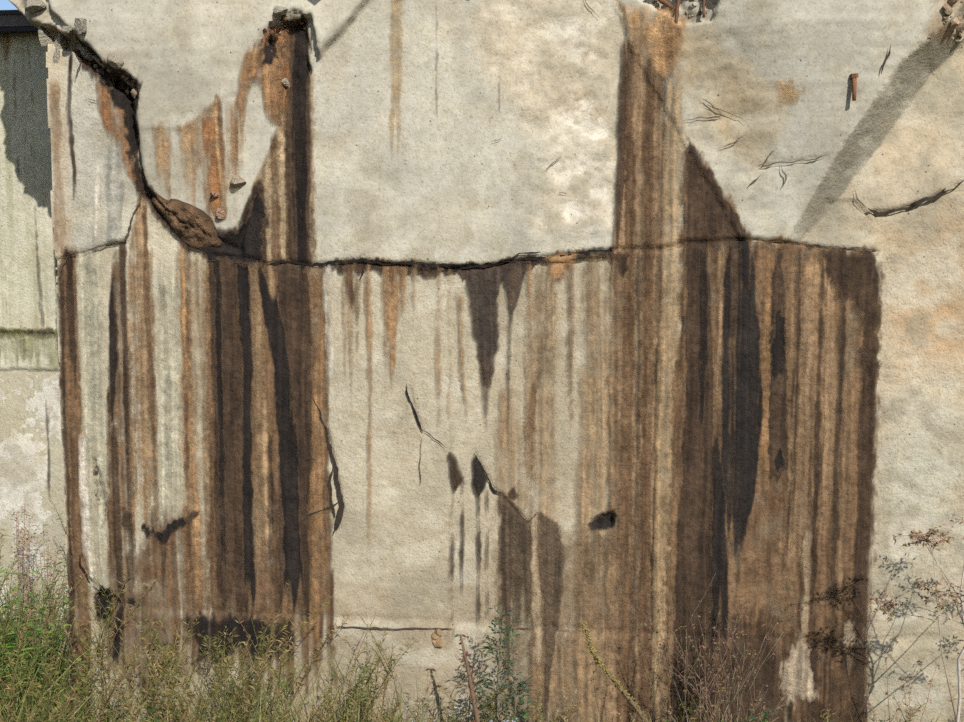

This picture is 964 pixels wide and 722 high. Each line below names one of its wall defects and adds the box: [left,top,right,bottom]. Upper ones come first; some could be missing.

spalling [652,0,717,18]
spalling [38,18,139,99]
crack [58,195,142,279]
crack [854,180,964,216]
damp [50,36,617,722]
crack [406,384,445,484]
crack [474,454,509,495]
damp [661,138,885,722]